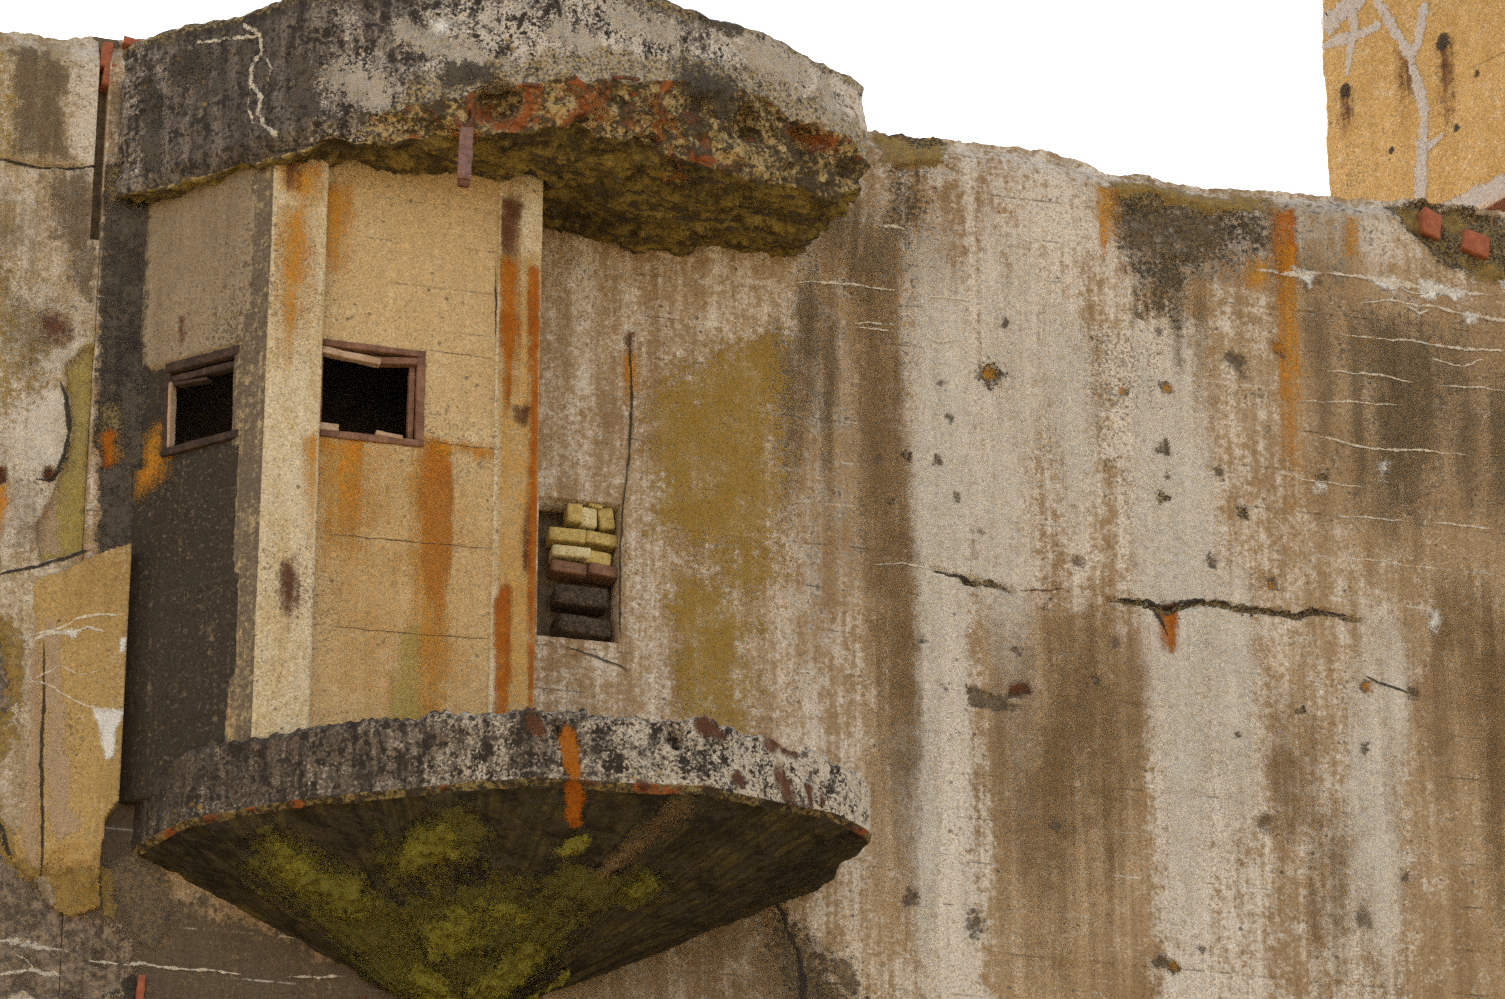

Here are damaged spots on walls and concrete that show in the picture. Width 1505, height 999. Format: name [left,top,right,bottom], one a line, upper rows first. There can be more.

corrosion [276,161,351,338]
leakage [1098,181,1505,336]
spalling [1383,198,1505,287]
leakage [1299,316,1503,532]
corrosion [279,561,300,616]
corrosion [410,196,586,828]
crack [873,562,1072,593]
leakage [866,217,1095,930]
leakage [1038,369,1254,893]
crack [1110,598,1361,635]
corrosion [694,715,725,741]
corrosion [765,737,825,809]